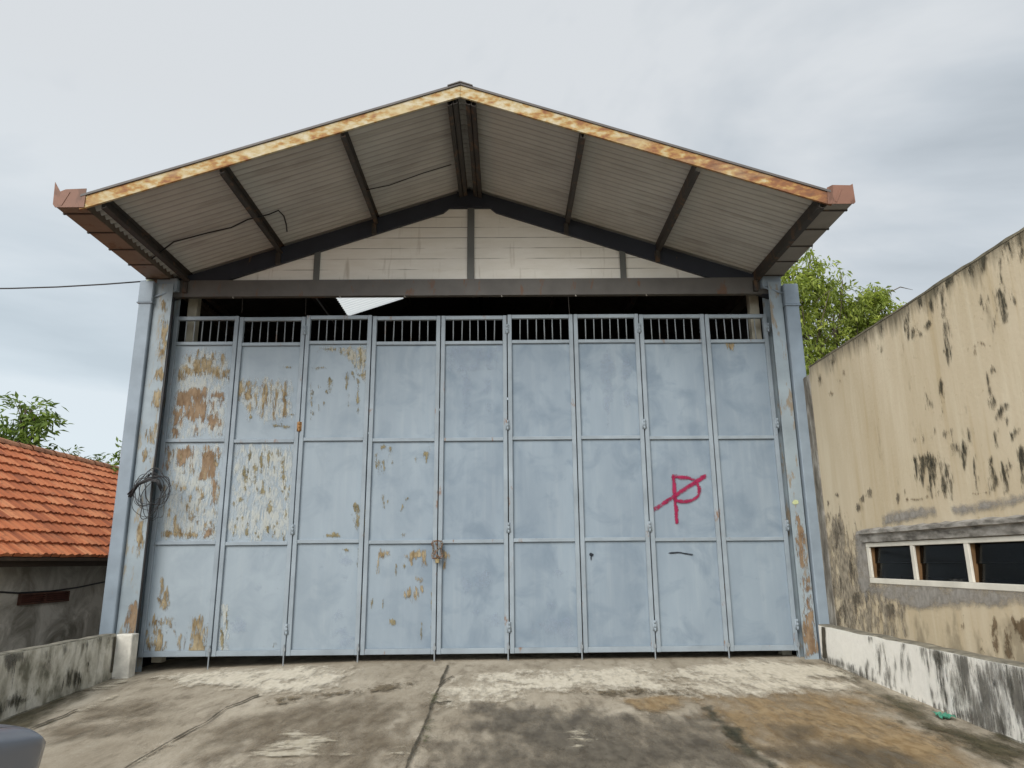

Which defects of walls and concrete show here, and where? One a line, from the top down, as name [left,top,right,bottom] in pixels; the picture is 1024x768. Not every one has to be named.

water stain [904,256,987,363]
water stain [980,235,1023,326]
peeling [162,349,294,541]
water stain [913,453,953,500]
water stain [934,428,979,495]
water stain [986,368,1024,491]
corrosion [795,515,819,658]
water stain [0,652,89,727]
crack [405,665,452,768]
water stain [427,636,1024,768]